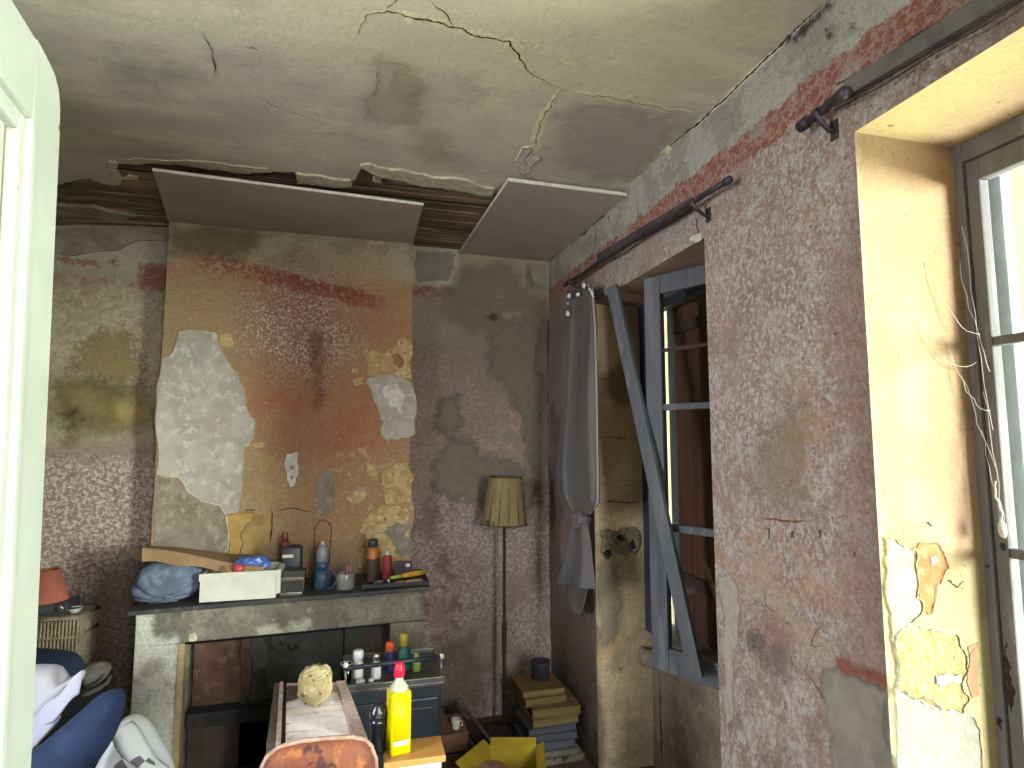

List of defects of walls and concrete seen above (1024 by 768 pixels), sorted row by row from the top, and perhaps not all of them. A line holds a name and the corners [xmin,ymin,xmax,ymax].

crack [358,0,829,178]
spalling [109,157,272,186]
spalling [360,163,494,196]
damp [48,328,151,445]
peeling [154,328,272,554]
peeling [284,451,299,488]
peeling [352,337,418,443]
damp [432,264,550,510]
peeling [881,534,980,714]